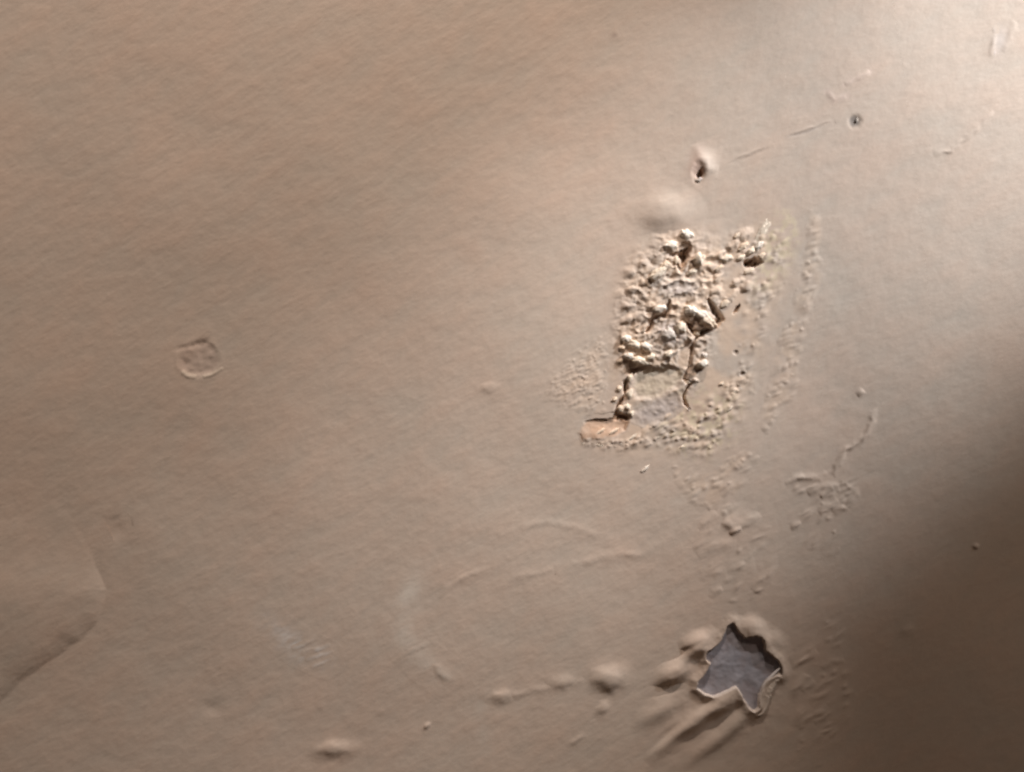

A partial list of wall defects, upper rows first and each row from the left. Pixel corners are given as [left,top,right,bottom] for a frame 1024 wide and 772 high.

hole [678,139,742,193]
flaking render [557,201,805,473]
spalling [630,610,794,771]